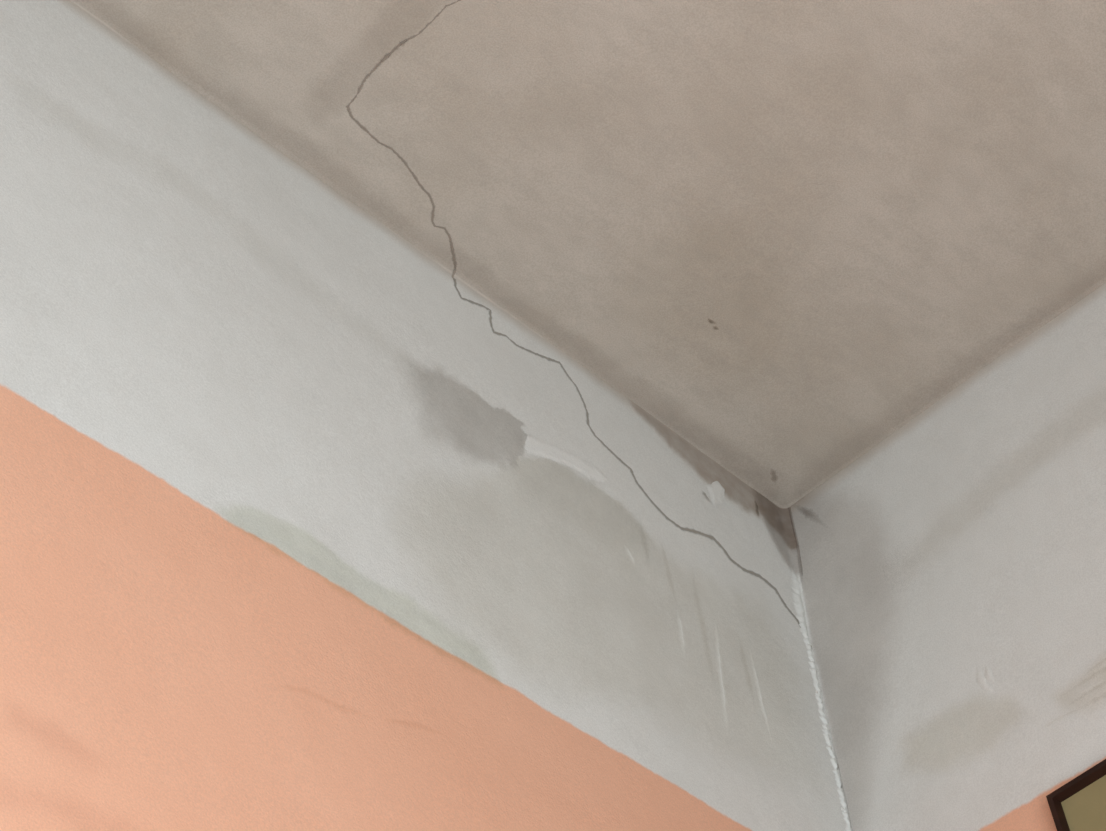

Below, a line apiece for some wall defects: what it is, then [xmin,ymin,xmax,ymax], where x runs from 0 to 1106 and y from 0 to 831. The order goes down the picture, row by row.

damp [521,432,610,485]
crack [347,0,801,628]